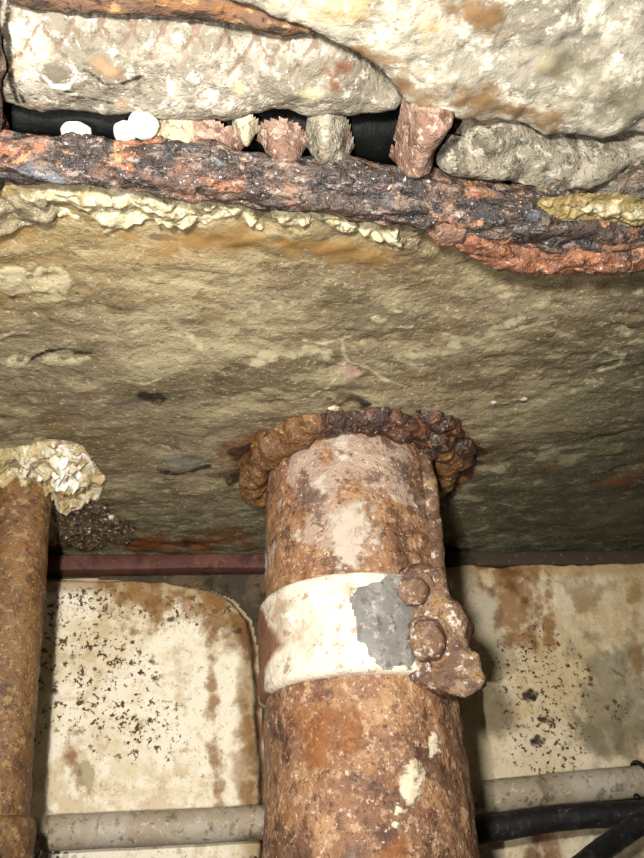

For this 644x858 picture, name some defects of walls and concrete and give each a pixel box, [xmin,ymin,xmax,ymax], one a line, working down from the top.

spalling [0,32,644,277]
leakage [0,439,106,516]
corrosion [221,396,492,508]